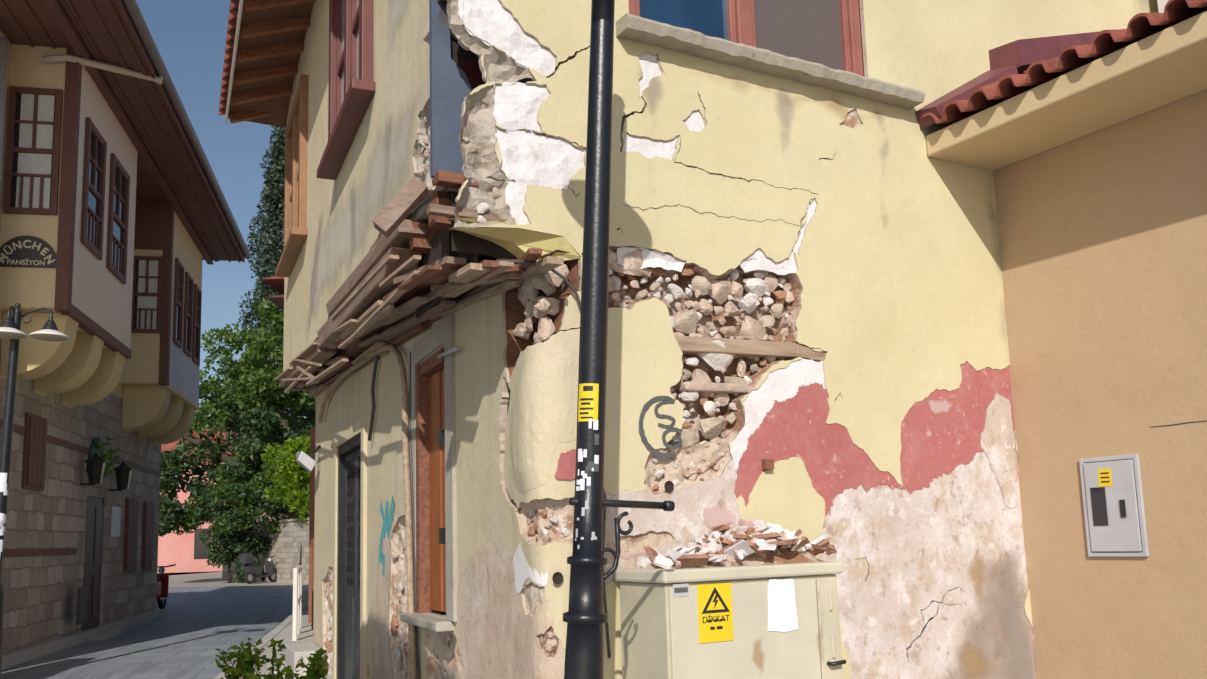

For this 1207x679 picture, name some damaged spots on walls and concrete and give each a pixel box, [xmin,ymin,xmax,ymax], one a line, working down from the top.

crack [548,47,588,78]
peeling [638,53,662,98]
spalling [447,0,585,227]
peeling [623,110,705,160]
crack [616,204,798,230]
spalling [505,250,583,378]
peeling [604,199,1036,679]
peeling [555,449,576,481]
peeling [371,497,574,679]